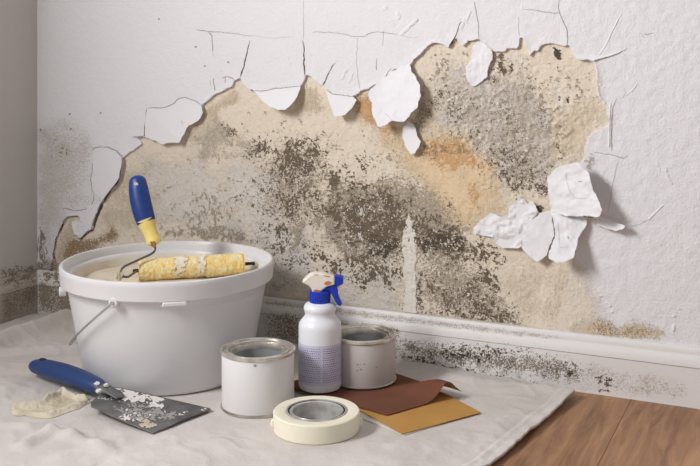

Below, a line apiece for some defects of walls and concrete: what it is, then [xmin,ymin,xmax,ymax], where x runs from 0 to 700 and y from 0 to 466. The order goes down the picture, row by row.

crack [197,29,283,90]
crack [255,4,305,92]
crack [322,32,416,97]
crack [449,3,479,47]
crack [518,3,568,43]
crack [134,97,201,138]
flaking render [52,38,625,330]
leakage [158,52,669,341]
crack [583,90,627,218]
mould [396,336,612,392]